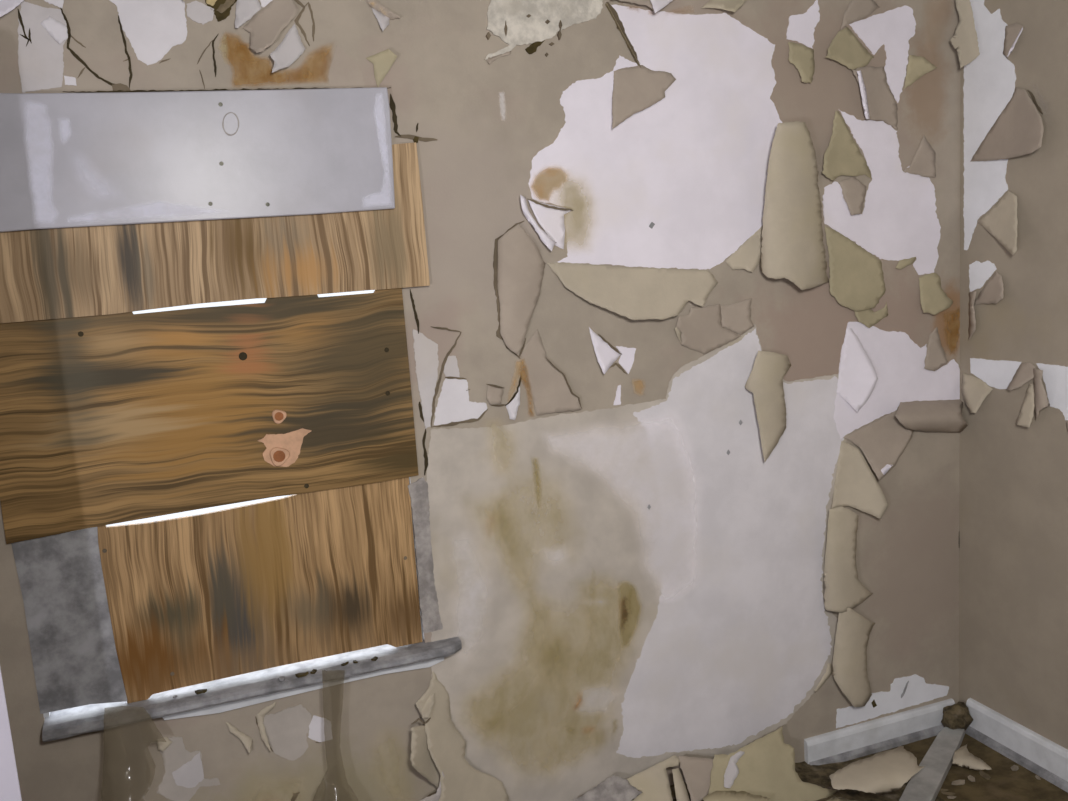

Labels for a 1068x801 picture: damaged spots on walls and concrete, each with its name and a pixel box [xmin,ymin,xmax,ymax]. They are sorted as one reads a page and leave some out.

crack [17,8,32,46]
flaking render [0,0,77,93]
flaking render [109,0,237,66]
crack [60,8,328,93]
peeling [372,8,390,31]
hole [525,19,562,57]
peeling [650,0,673,13]
damp [550,421,695,596]
damp [455,541,486,647]
damp [468,459,641,772]
flaking render [255,702,333,761]
flaking render [836,674,949,728]